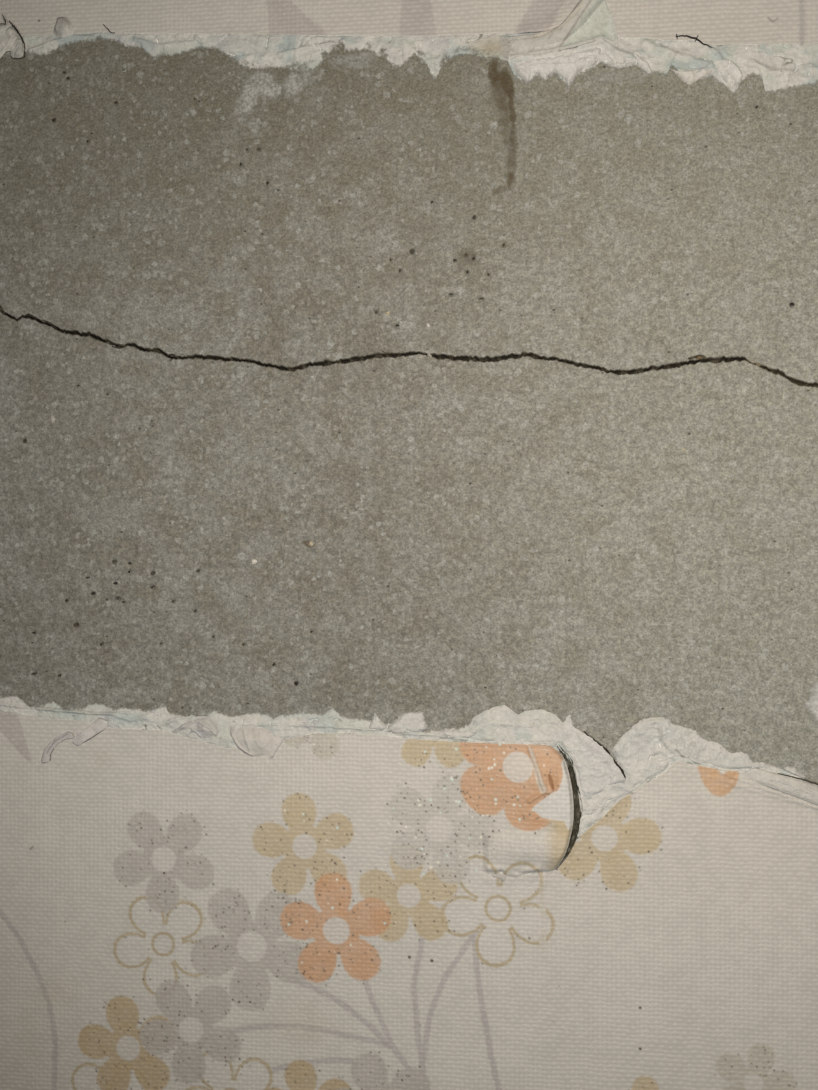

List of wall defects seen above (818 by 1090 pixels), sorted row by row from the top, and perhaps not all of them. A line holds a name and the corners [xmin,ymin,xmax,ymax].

peeling [0,14,25,59]
peeling [502,0,619,59]
crack [0,306,818,388]
peeling [576,717,818,838]